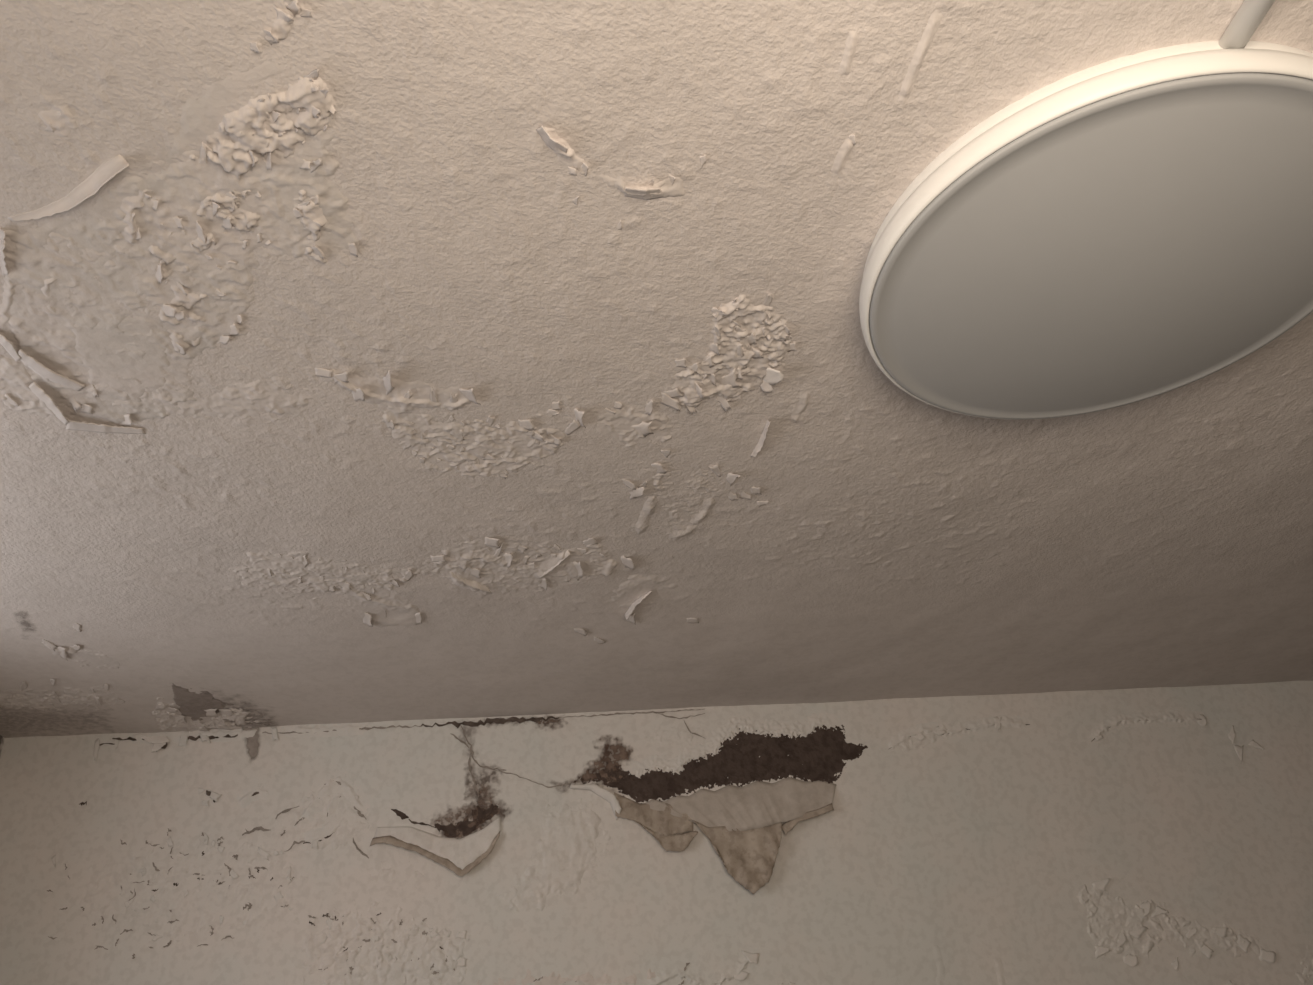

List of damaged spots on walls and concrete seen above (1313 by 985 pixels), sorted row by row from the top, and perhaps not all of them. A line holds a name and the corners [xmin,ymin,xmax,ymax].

peeling [0,0,798,542]
peeling [228,537,683,628]
spalling [141,683,271,752]
spalling [367,789,506,882]
spalling [570,712,868,894]